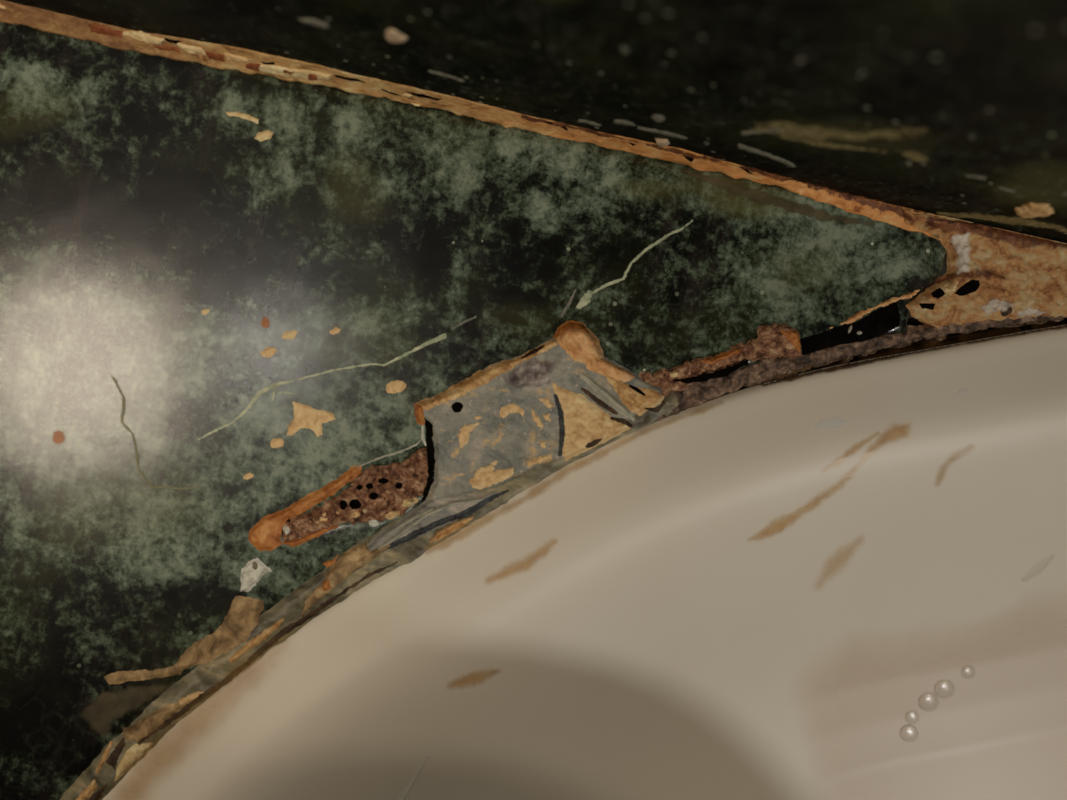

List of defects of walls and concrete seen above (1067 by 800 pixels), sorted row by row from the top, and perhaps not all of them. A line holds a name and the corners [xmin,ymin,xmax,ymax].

rust [205,51,225,62]
rust [926,217,1067,248]
crack [560,220,693,318]
rust [935,270,1006,283]
rust [830,289,920,329]
rust [639,323,802,397]
peeling [248,320,666,551]
rust [833,426,907,465]
rust [757,497,822,537]
peeling [228,619,284,663]
peeling [179,691,204,705]
peeling [115,742,153,781]